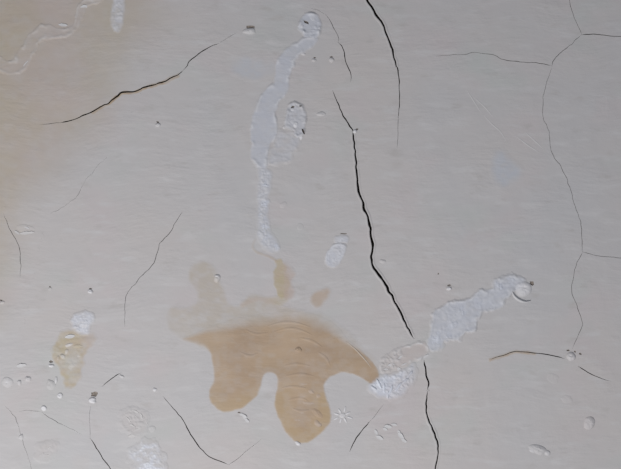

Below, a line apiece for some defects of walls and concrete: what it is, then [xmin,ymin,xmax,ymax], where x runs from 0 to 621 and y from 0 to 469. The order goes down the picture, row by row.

crack [50,33,236,124]
crack [364,0,400,116]
crack [443,0,621,95]
water stain [165,11,420,444]
crack [333,92,416,340]
crack [571,252,617,344]
water stain [49,309,99,390]
crack [492,351,564,359]
crack [165,399,259,464]
crack [423,362,441,469]